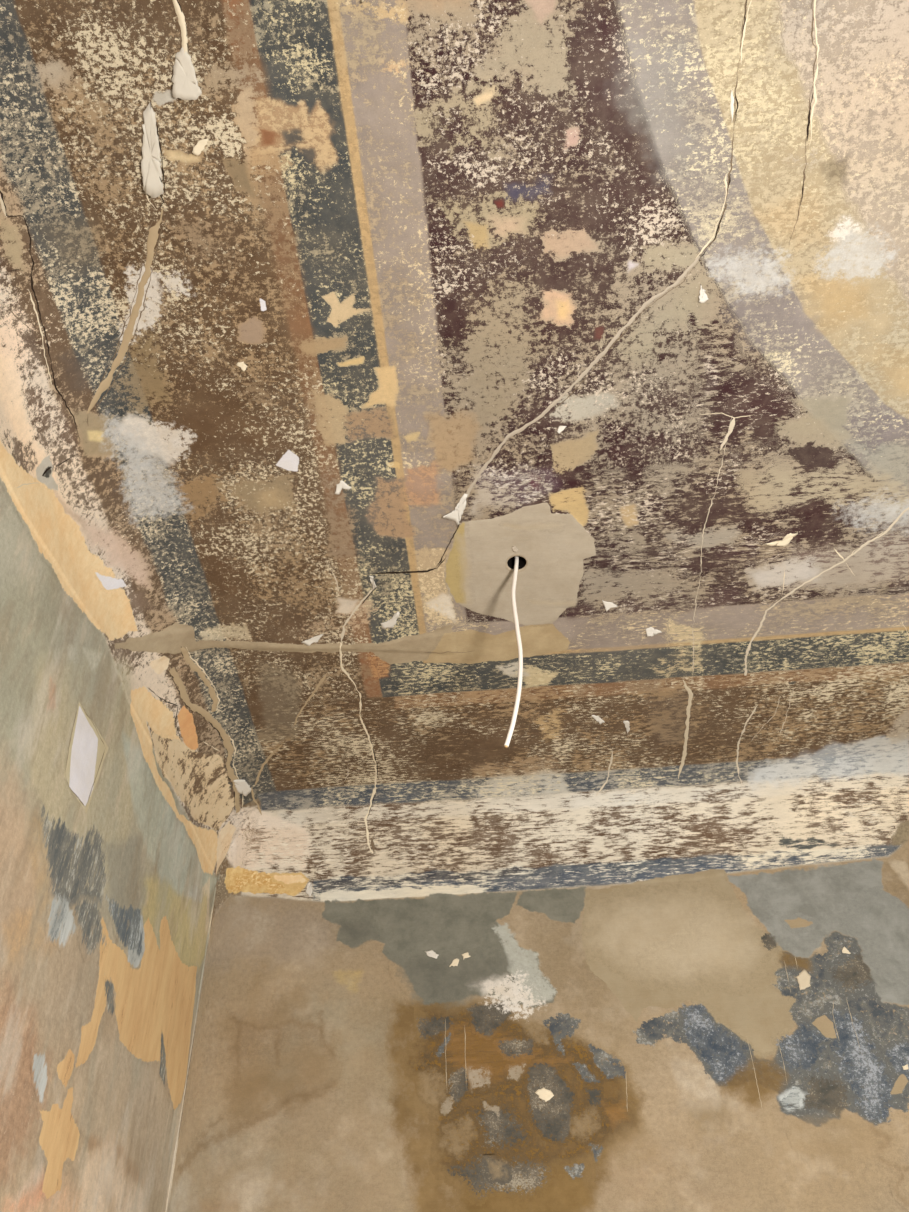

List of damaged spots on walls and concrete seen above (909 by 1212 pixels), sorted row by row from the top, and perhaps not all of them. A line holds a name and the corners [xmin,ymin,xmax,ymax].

crack [0,0,202,466]
crack [789,0,820,243]
spalling [0,434,141,646]
crack [148,0,752,853]
spalling [507,556,526,570]
crack [744,508,909,676]
crack [736,681,798,785]
peeling [36,913,198,1204]
damp [319,884,662,1212]
peeling [631,931,909,1127]